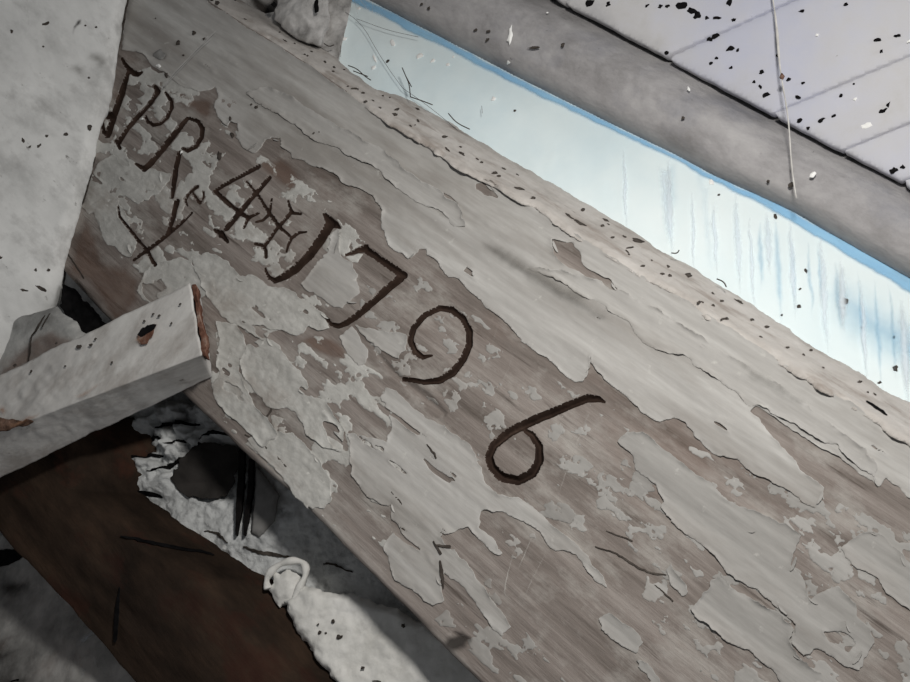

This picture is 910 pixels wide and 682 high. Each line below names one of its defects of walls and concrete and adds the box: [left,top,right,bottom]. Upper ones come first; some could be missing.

peeling [82,125,235,258]
spalling [60,284,107,334]
peeling [122,0,910,610]
peeling [557,427,883,682]
peeling [878,639,910,682]